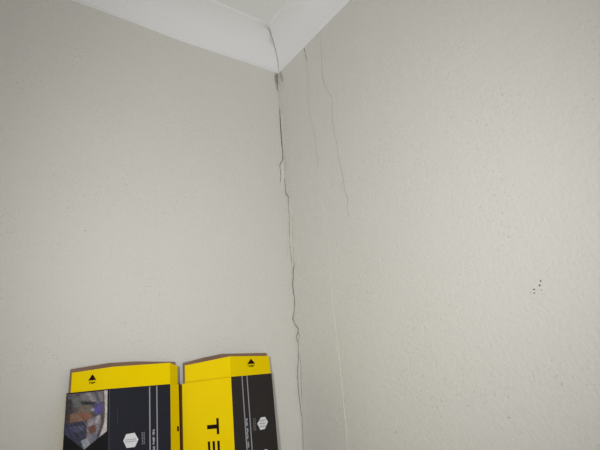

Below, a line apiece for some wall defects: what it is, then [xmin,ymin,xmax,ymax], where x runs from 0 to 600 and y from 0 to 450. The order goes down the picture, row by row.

crack [279,107,303,427]